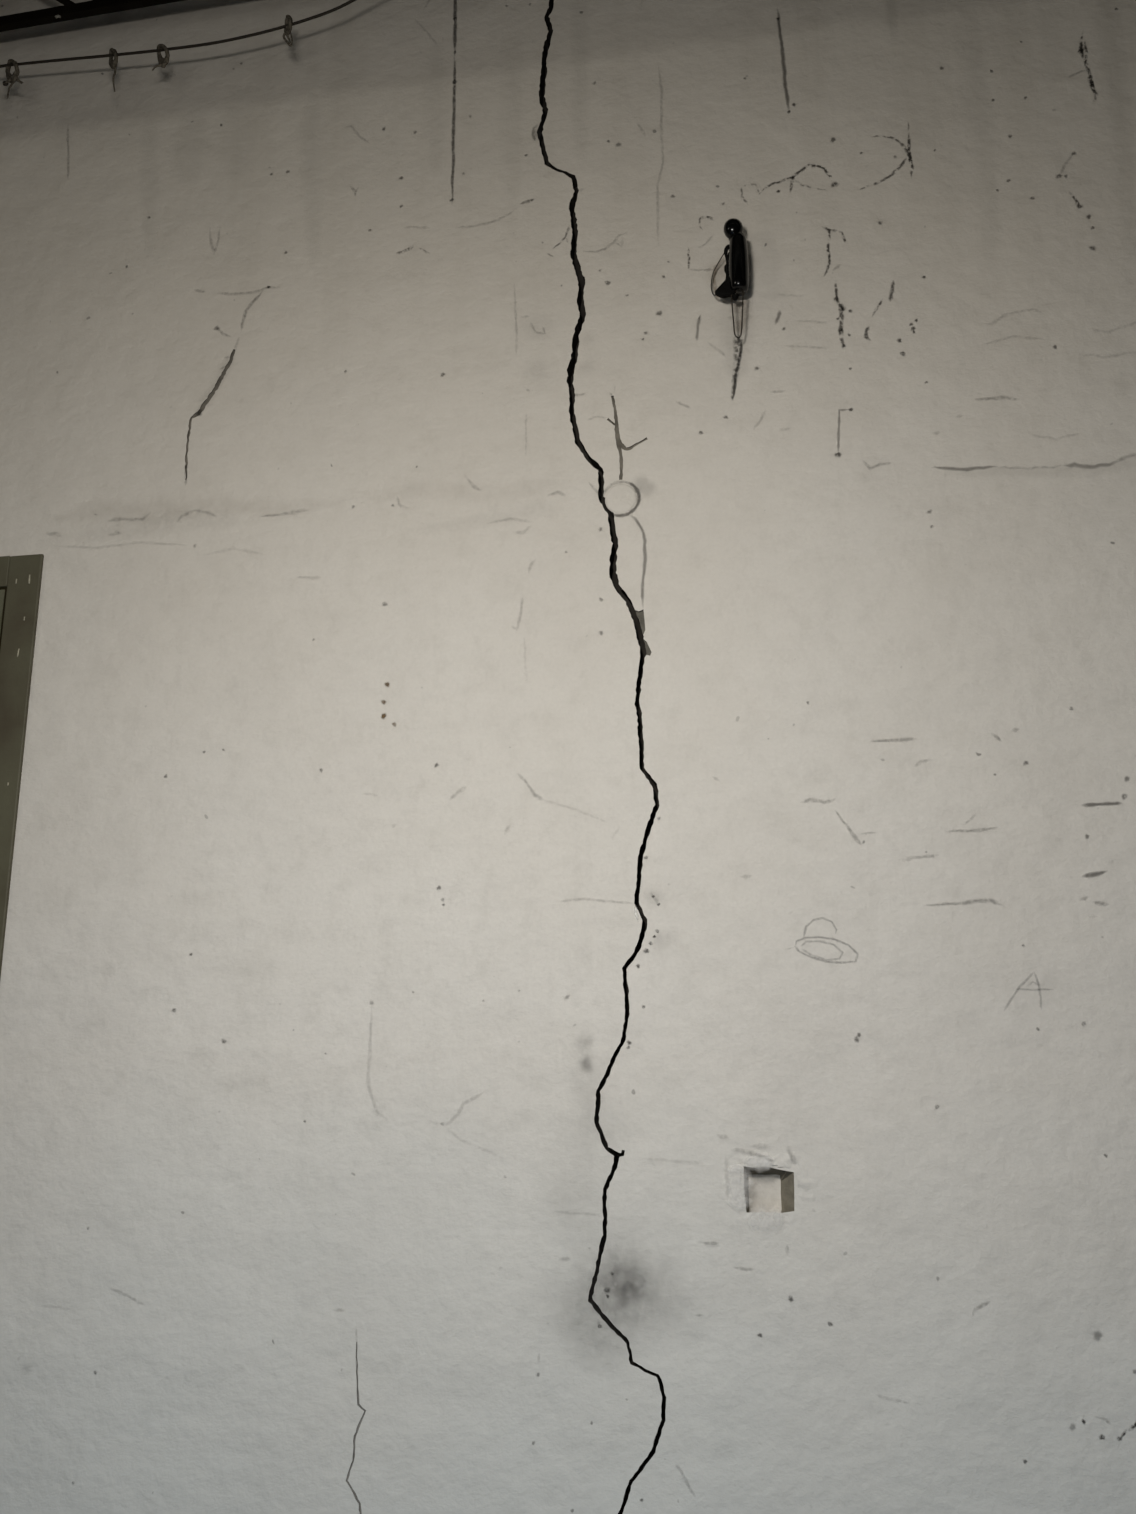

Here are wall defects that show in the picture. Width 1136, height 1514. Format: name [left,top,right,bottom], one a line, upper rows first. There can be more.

crack [346,1342,366,1514]
crack [537,0,666,1514]